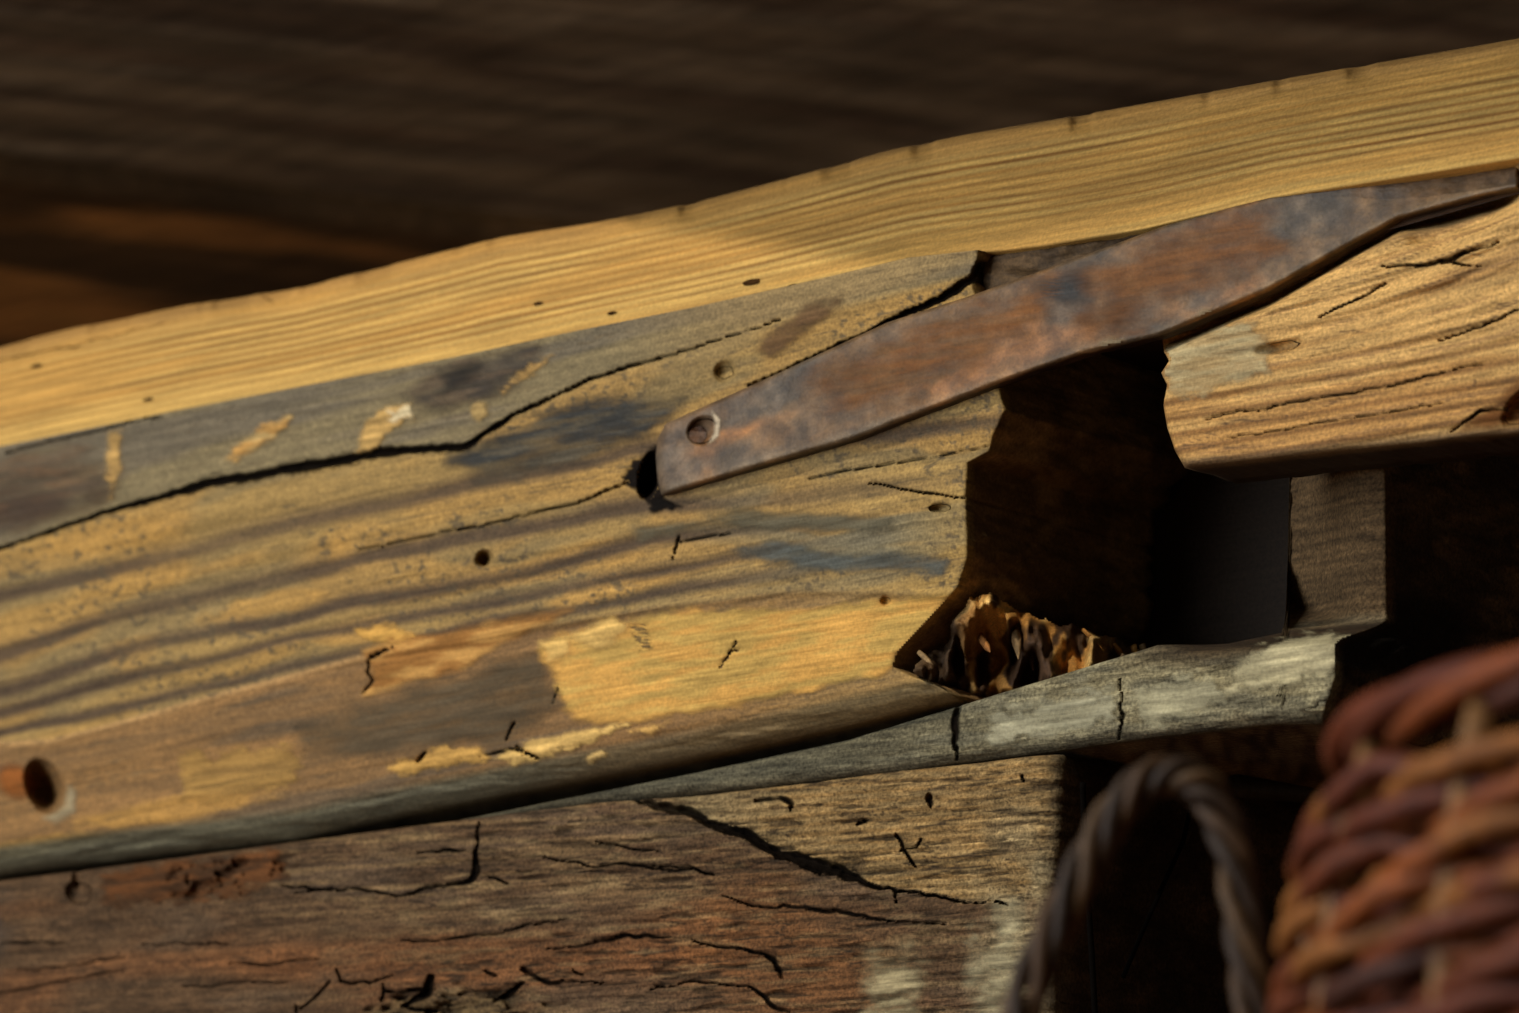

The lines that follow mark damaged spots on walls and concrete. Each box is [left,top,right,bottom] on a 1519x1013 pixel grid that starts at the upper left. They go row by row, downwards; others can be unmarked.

crack [1326,248,1480,314]
crack [763,267,979,380]
crack [1225,374,1439,432]
crack [0,358,660,550]
crack [833,450,963,494]
crack [950,709,959,757]
crack [302,842,500,896]
crack [564,843,708,874]
crack [641,796,960,923]
crack [150,942,434,1013]
crack [414,921,667,999]
crack [670,944,783,1010]